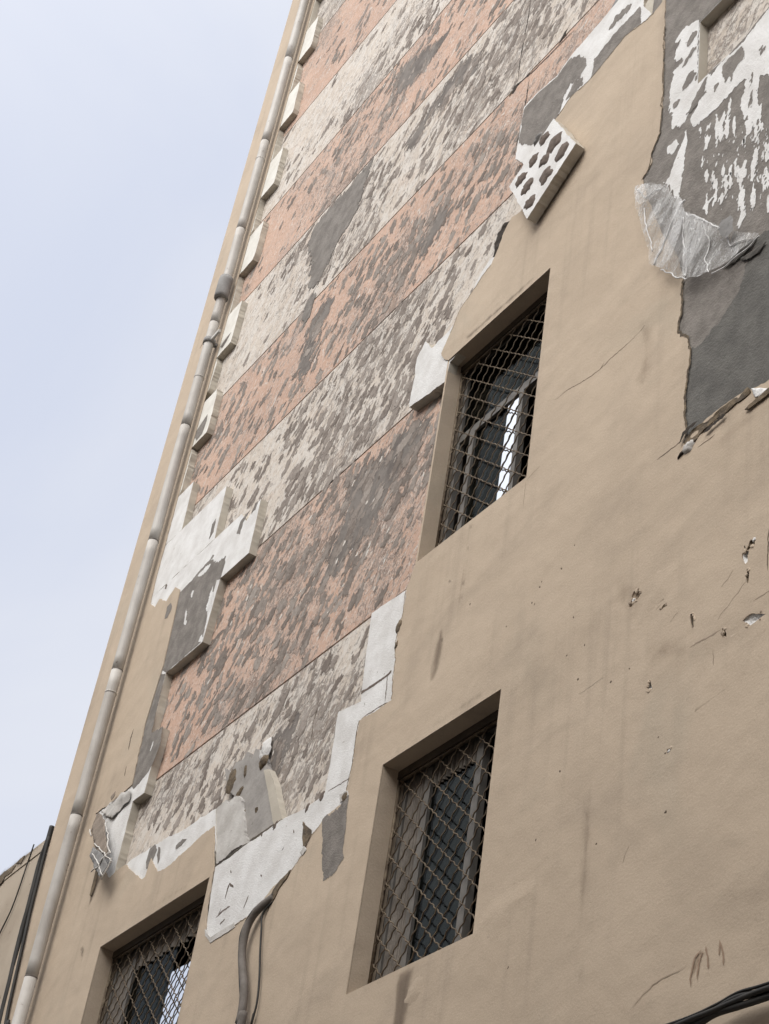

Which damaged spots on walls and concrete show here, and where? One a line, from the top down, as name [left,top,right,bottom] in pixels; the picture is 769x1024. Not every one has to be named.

peeling [663,8,769,229]
spalling [677,387,769,459]
peeling [198,553,225,577]
spalling [743,537,756,582]
peeling [226,754,269,796]
peeling [293,790,349,881]
peeling [89,847,108,897]
spalling [205,870,235,943]
spalling [268,870,291,908]